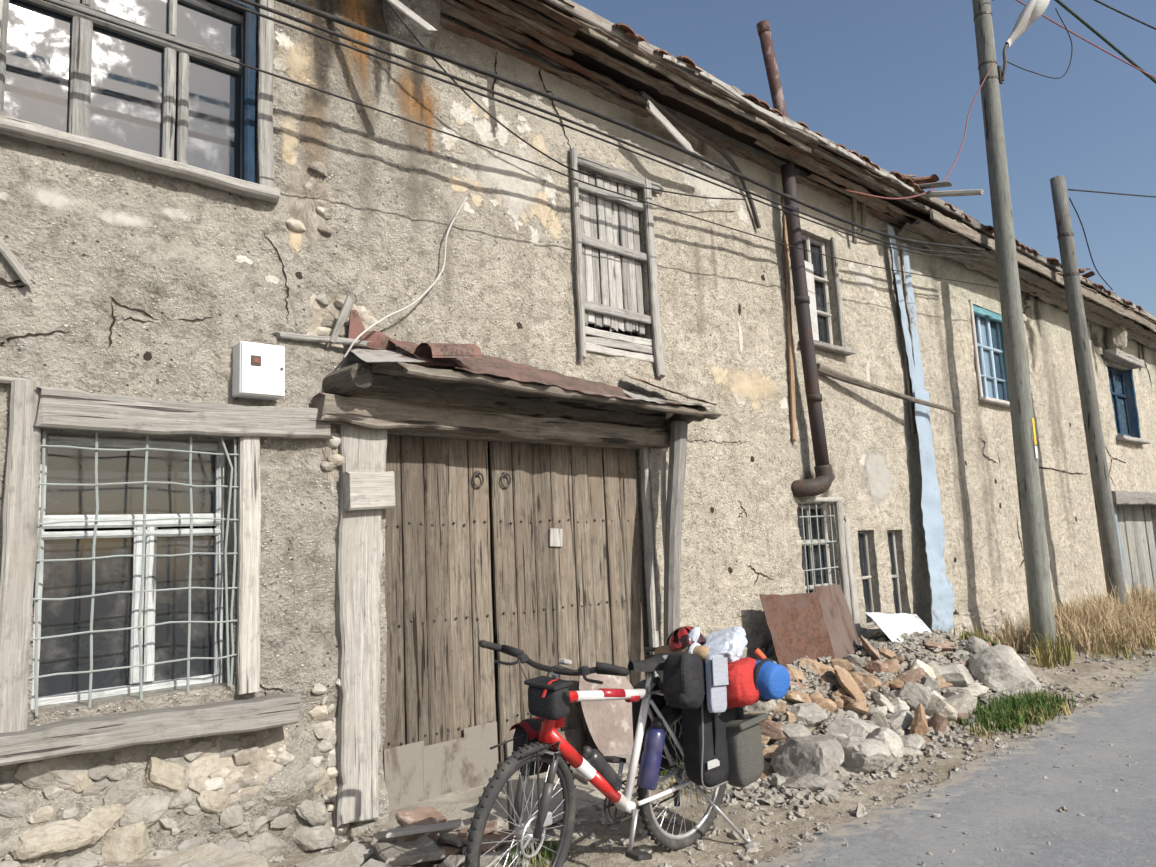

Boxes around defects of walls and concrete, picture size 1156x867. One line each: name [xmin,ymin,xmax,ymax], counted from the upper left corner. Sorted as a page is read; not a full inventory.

rust [345,0,368,84]
damp [306,0,423,183]
rust [405,83,432,149]
peeling [440,97,561,247]
crack [0,277,25,288]
crack [261,229,289,323]
crack [0,330,70,346]
crack [107,296,212,349]
crack [978,437,1000,464]